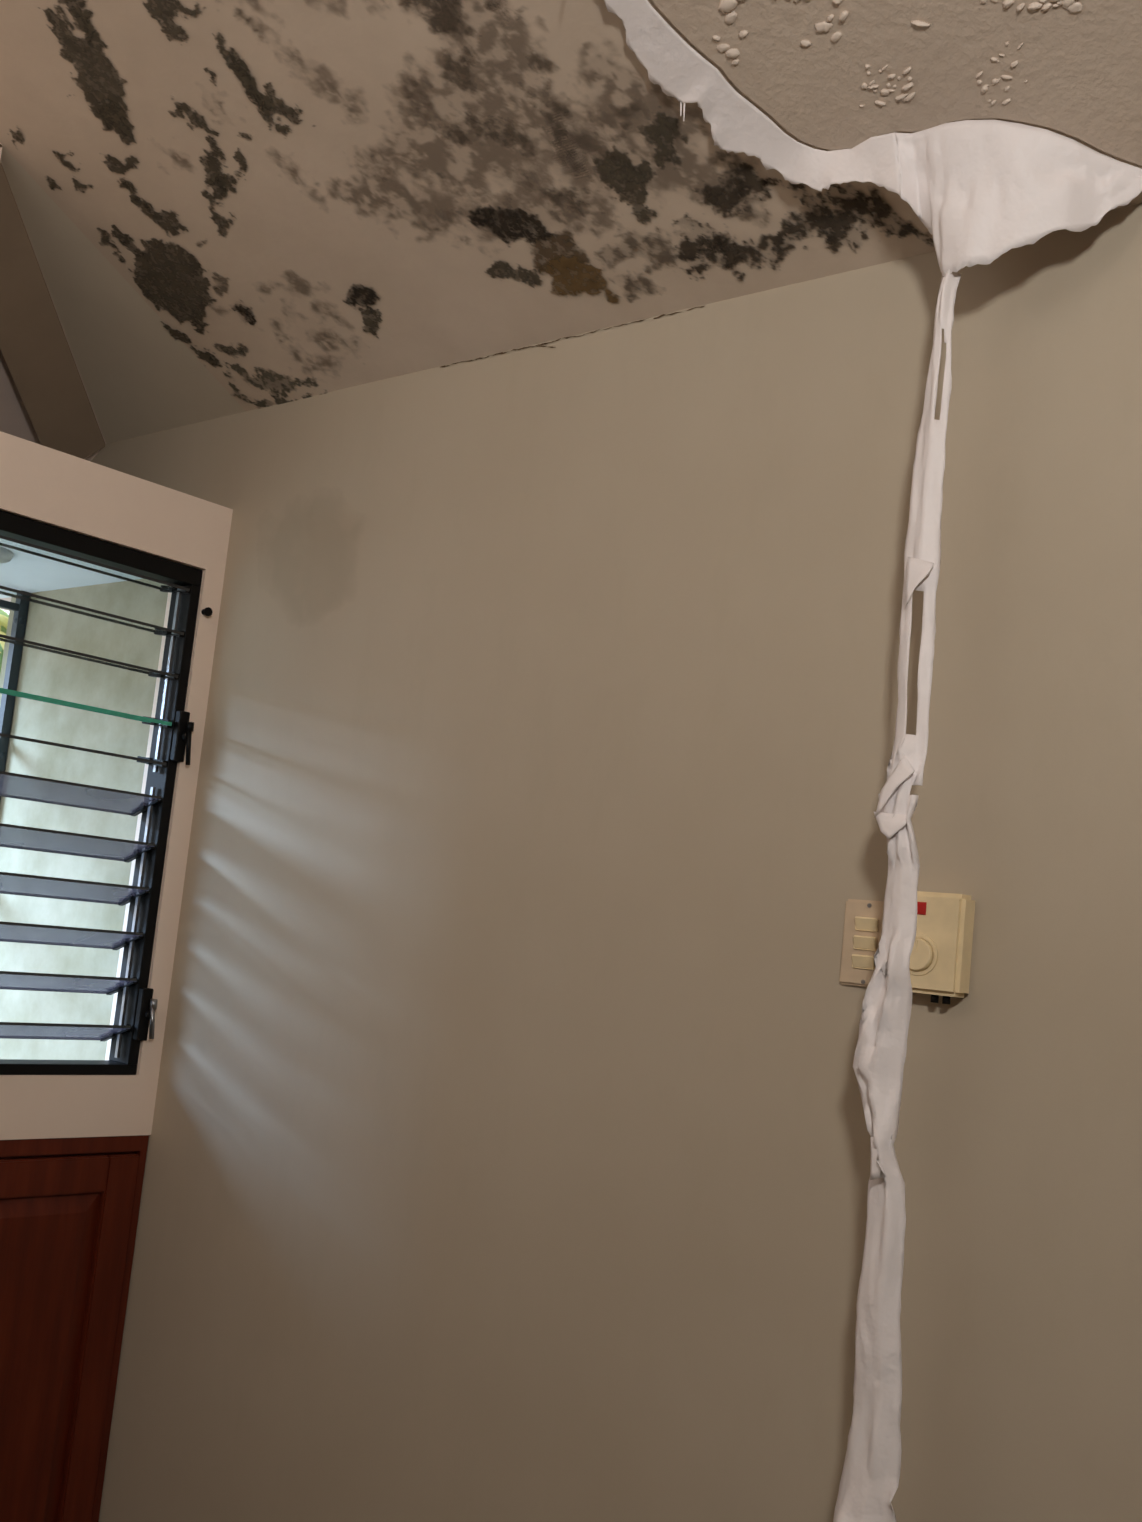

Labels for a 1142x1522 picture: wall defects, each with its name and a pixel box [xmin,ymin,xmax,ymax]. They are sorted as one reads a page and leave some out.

damp [335,0,934,302]
damp [343,284,382,338]
peeling [604,0,1142,1522]